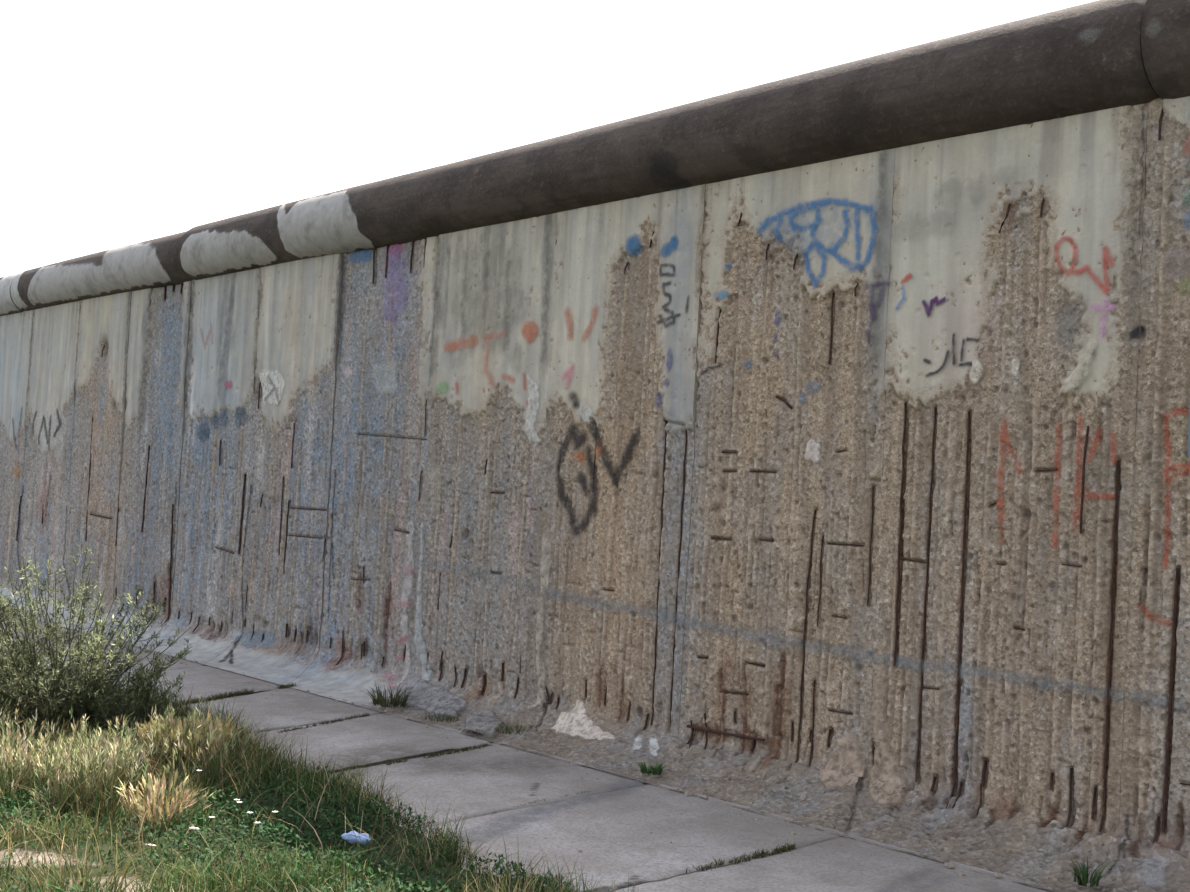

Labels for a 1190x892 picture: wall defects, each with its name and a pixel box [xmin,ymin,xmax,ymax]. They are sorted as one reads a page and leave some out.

peeling [0,269,28,315]
peeling [27,243,171,306]
peeling [180,230,279,337]
spalling [694,201,716,263]
spalling [0,392,75,601]
rust [773,653,785,758]